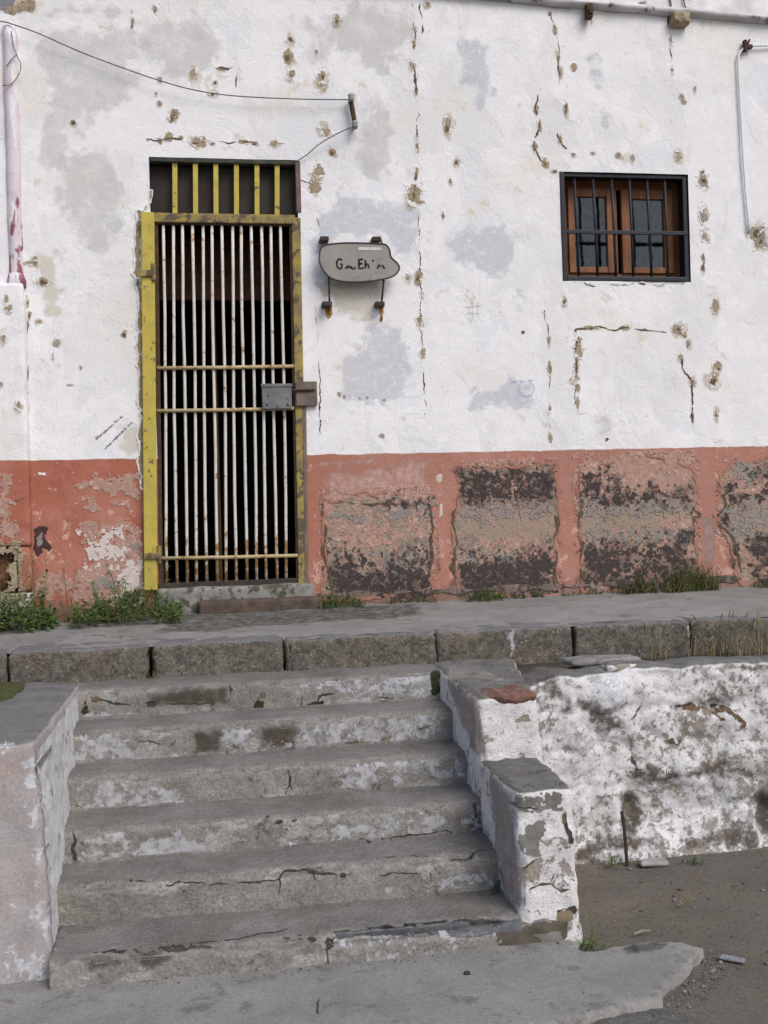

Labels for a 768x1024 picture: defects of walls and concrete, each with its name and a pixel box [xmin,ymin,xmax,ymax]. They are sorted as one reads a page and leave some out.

crack [531,11,569,174]
peeling [0,189,153,613]
crack [542,309,697,442]
peeling [316,438,768,603]
crack [70,832,351,892]
peeling [510,791,563,857]
crack [94,928,335,964]